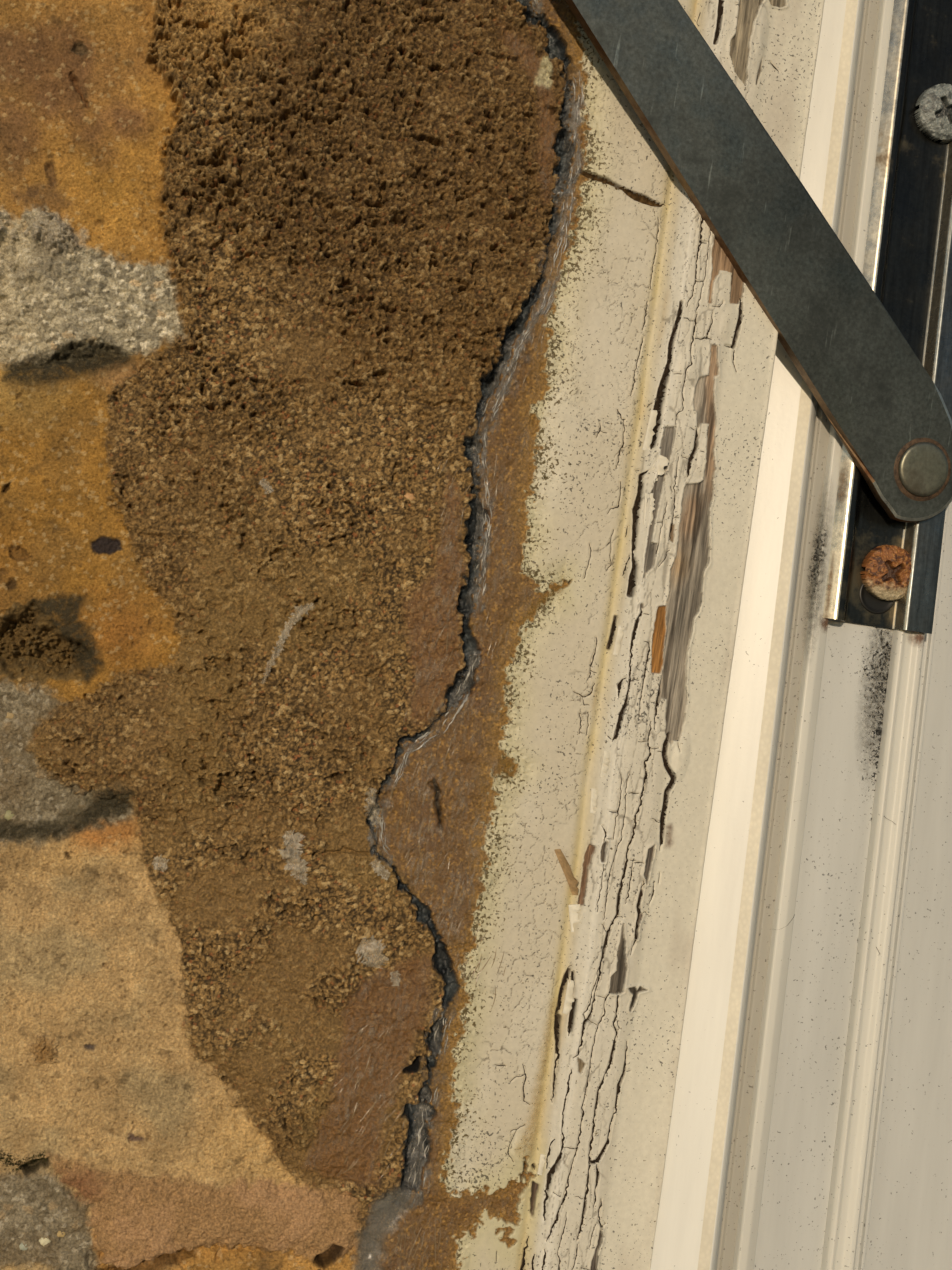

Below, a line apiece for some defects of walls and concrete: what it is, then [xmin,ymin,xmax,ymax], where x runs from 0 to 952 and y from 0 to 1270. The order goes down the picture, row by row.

peeling [709,239,745,304]
peeling [641,344,719,744]
crack [366,0,742,1270]
peeling [613,625,624,655]
peeling [554,841,609,932]
peeling [644,845,656,884]
peeling [609,913,647,1011]
peeling [562,980,574,1014]
peeling [530,1154,546,1216]
peeling [591,1227,604,1270]